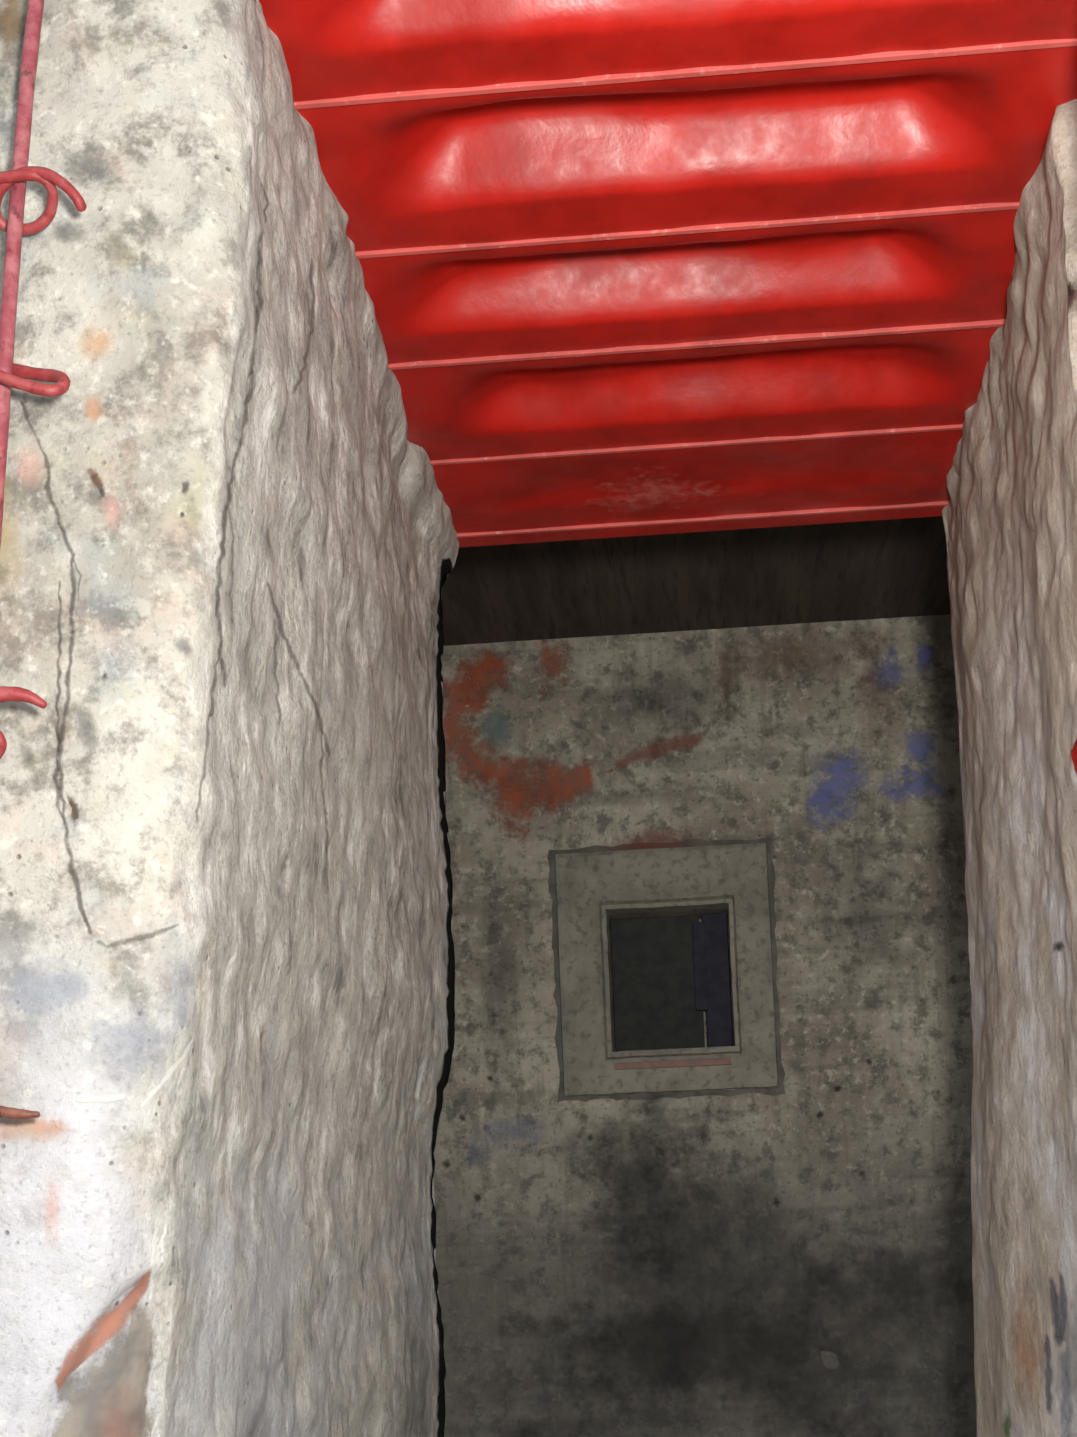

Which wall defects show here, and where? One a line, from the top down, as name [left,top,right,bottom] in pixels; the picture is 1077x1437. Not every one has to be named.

crack [21,402,91,933]
crack [431,558,455,1437]